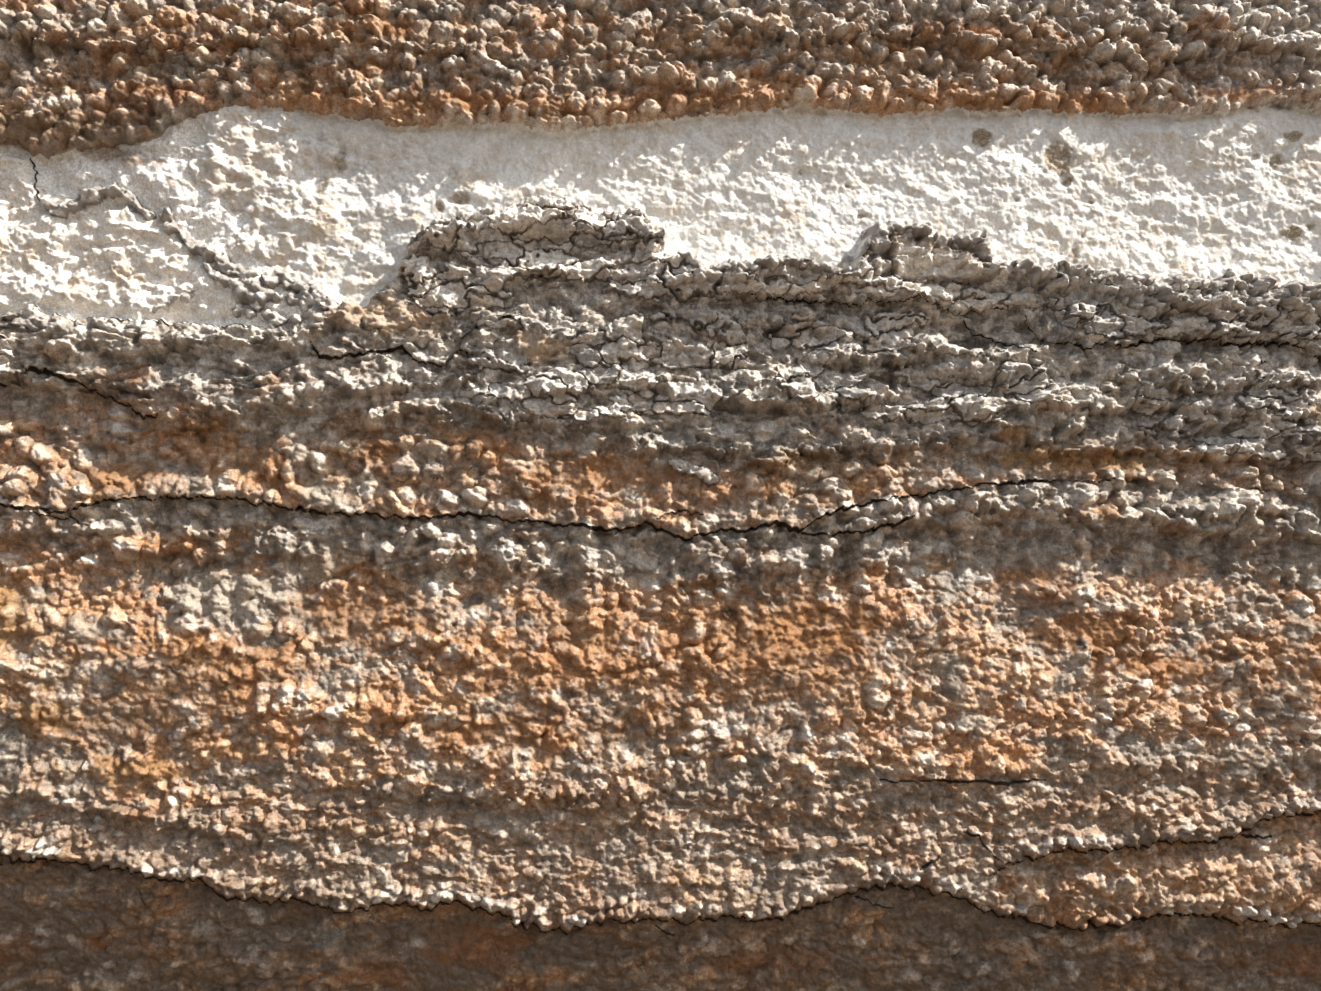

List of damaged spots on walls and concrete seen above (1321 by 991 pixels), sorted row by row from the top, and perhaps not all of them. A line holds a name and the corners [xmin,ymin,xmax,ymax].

crack [30,158,40,202]
spalling [0,99,1321,431]
crack [0,477,1116,541]
crack [879,778,1046,786]
crack [0,810,1321,936]